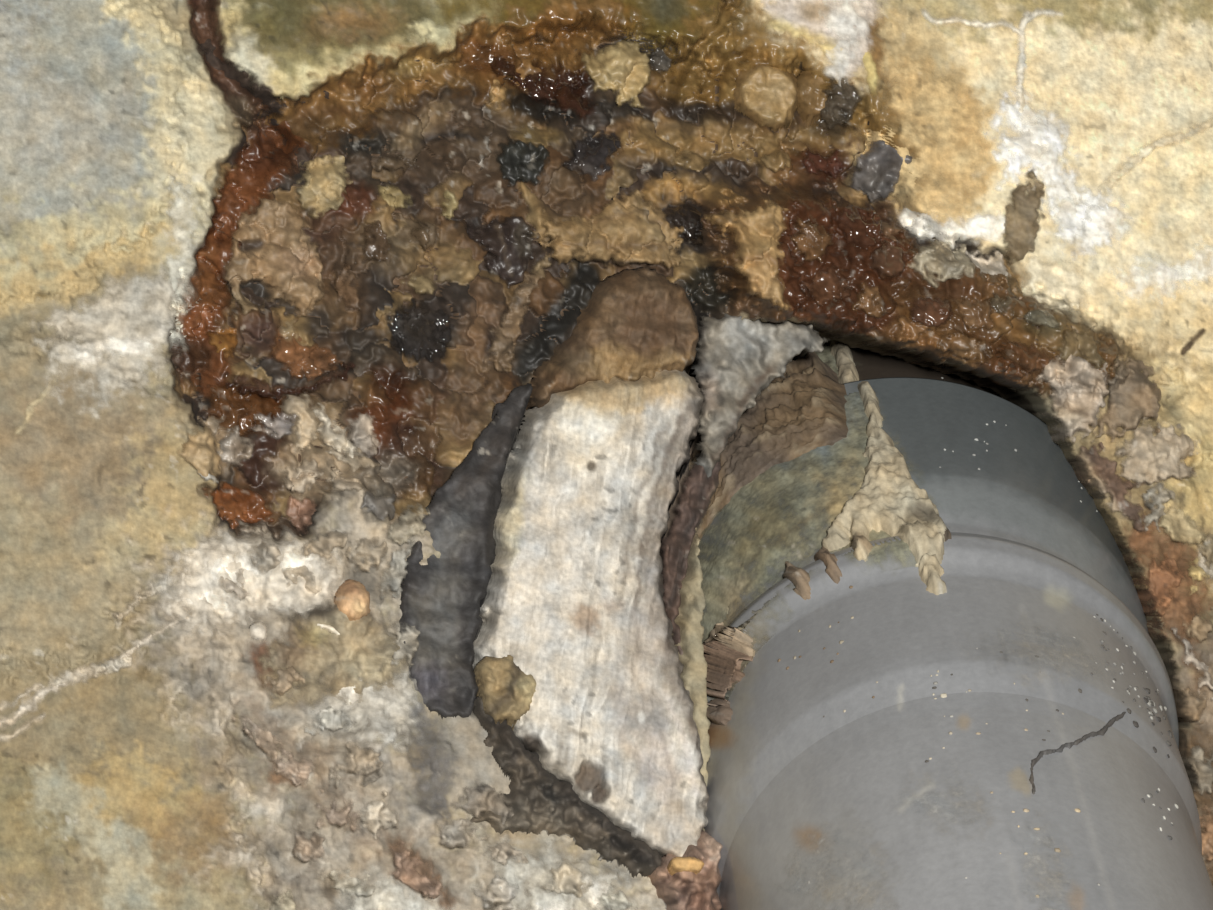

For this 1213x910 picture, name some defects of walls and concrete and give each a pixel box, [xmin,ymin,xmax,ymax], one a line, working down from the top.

crack [188,0,329,175]
rust [178,0,622,436]
spalling [169,19,1213,734]
crack [0,581,192,740]
efflorescence [160,530,341,635]
rust [1121,517,1213,689]
spalling [293,742,399,862]
leakage [317,673,452,818]
leakage [351,879,440,910]
leakage [489,841,620,910]
rust [1179,724,1213,767]
spalling [1182,746,1213,861]